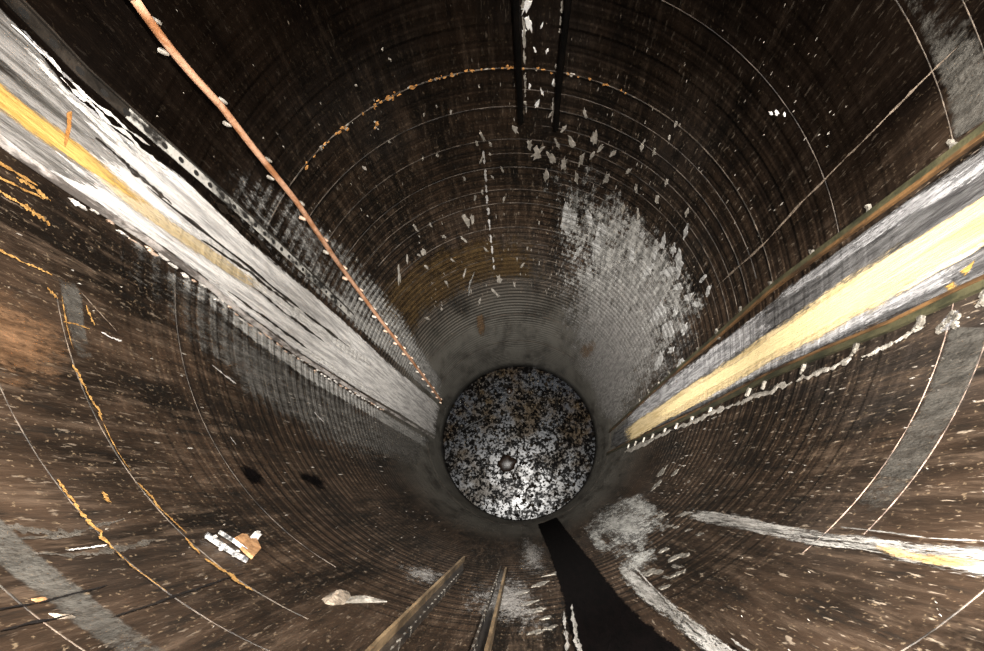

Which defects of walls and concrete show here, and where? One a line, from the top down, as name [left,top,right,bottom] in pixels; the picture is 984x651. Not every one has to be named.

corrosion [362,65,553,115]
corrosion [0,161,51,226]
water stain [544,148,984,453]